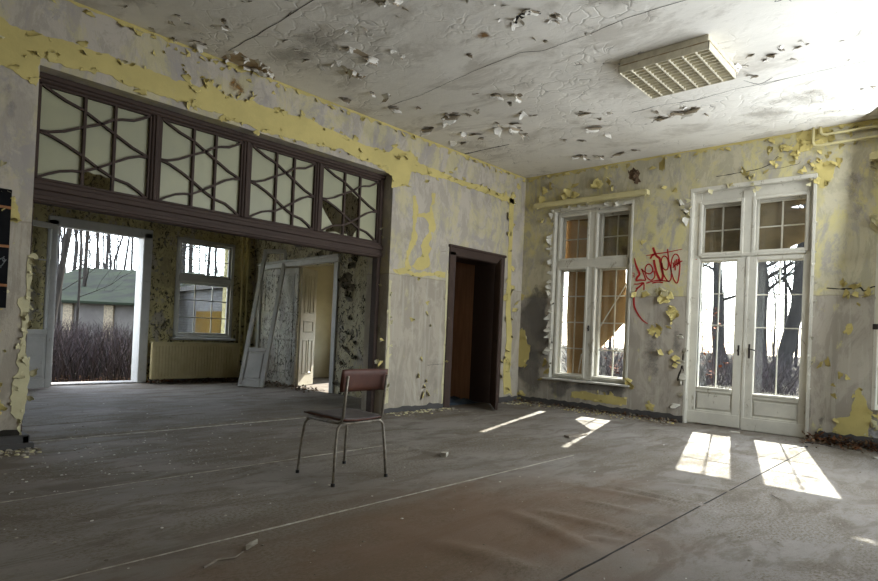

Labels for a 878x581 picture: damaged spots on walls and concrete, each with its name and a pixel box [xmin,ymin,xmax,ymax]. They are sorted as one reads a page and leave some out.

crack [228,0,313,51]
peeling [0,0,878,409]
peeling [0,250,41,435]
water stain [518,292,552,390]
water stain [551,382,624,397]